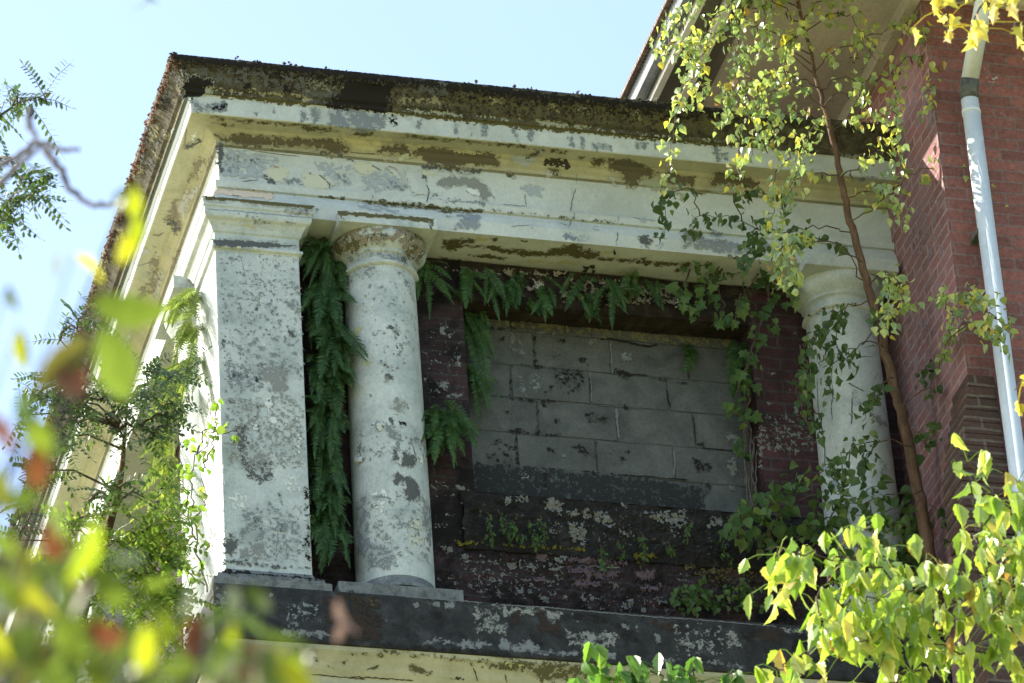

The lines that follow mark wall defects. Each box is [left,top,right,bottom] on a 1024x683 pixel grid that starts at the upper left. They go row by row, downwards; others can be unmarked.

peeling [403,108,508,122]
peeling [535,119,722,143]
water stain [118,53,732,383]
peeling [156,130,773,280]
spalling [134,246,181,300]
spalling [252,364,303,456]
spalling [371,446,423,513]
water stain [204,237,813,669]
spalling [208,525,266,559]
spalling [566,554,662,594]